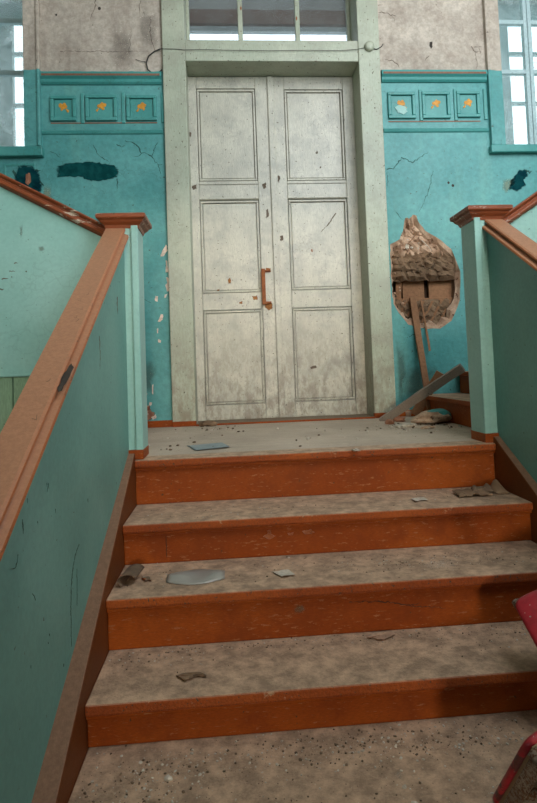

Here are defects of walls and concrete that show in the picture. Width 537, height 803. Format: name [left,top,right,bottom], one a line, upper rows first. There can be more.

crack [60,1,155,52]
crack [93,140,162,173]
peeling [155,245,169,302]